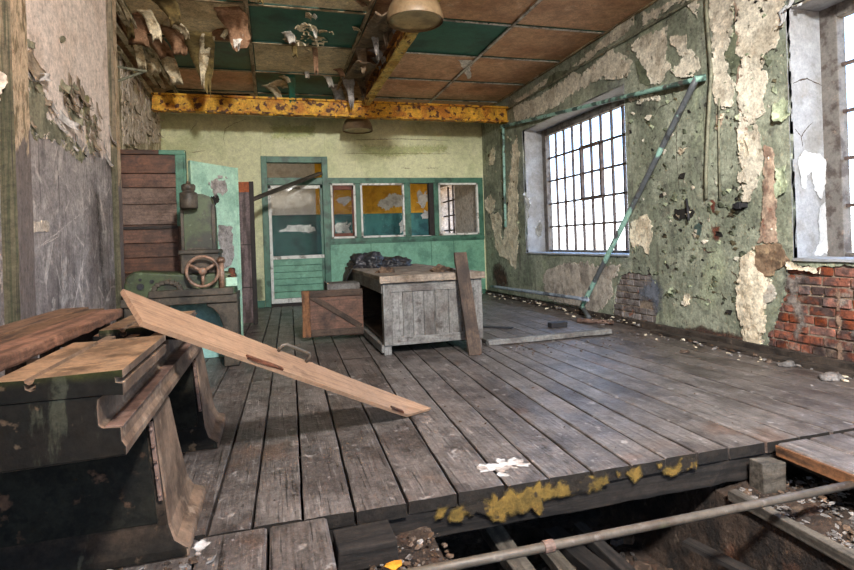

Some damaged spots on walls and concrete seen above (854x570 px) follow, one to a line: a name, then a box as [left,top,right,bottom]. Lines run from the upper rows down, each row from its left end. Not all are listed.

peeling [0,71,8,100]
peeling [27,0,251,167]
peeling [261,12,334,103]
peeling [335,221,351,233]
peeling [378,193,402,211]
peeling [416,190,428,219]
peeling [444,120,543,270]
peeling [513,0,854,362]